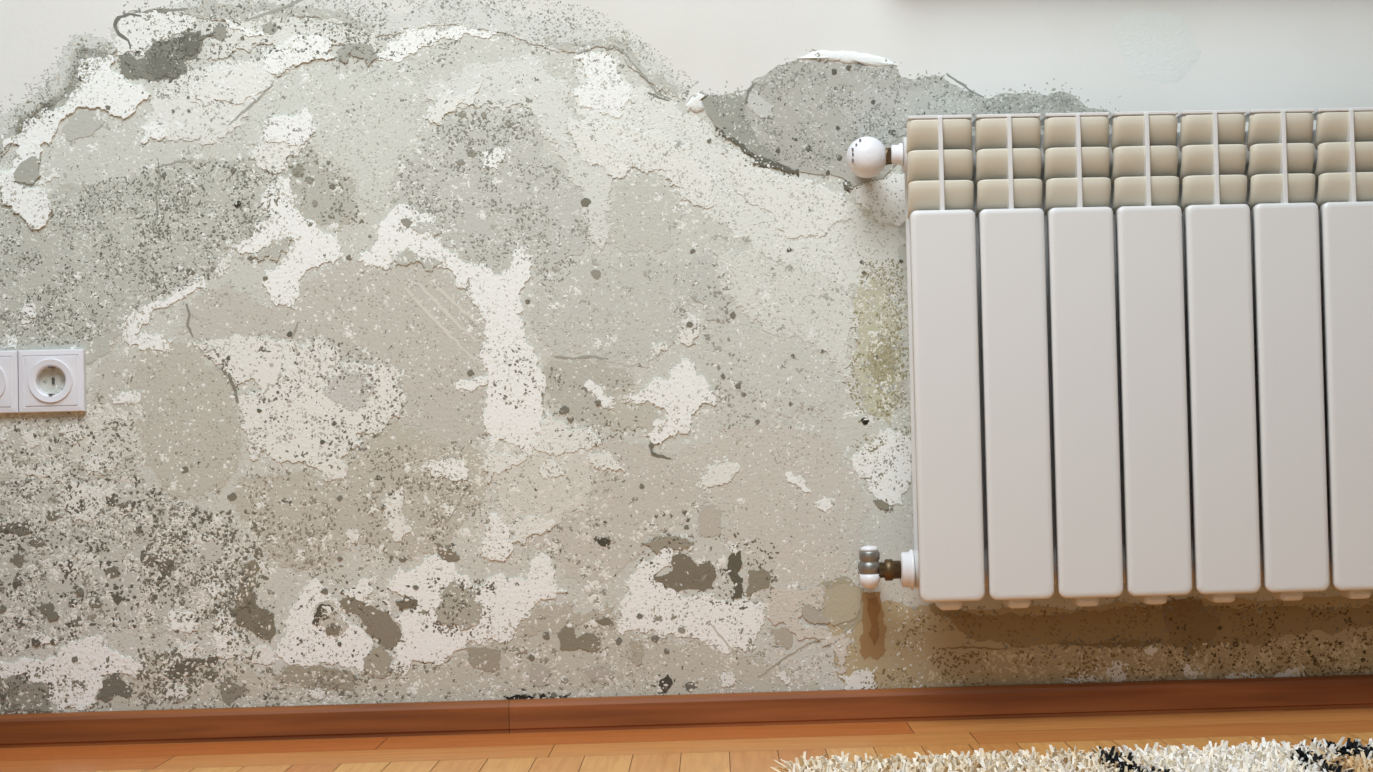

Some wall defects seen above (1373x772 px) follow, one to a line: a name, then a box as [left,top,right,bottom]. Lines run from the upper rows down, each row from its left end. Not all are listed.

crack [113,0,303,49]
damp [0,0,1106,714]
peeling [1030,583,1145,610]
peeling [1167,581,1206,601]
peeling [1235,579,1276,601]
peeling [1303,577,1340,597]
rust [859,592,887,660]
damp [428,527,1373,702]
peeling [1065,661,1127,683]